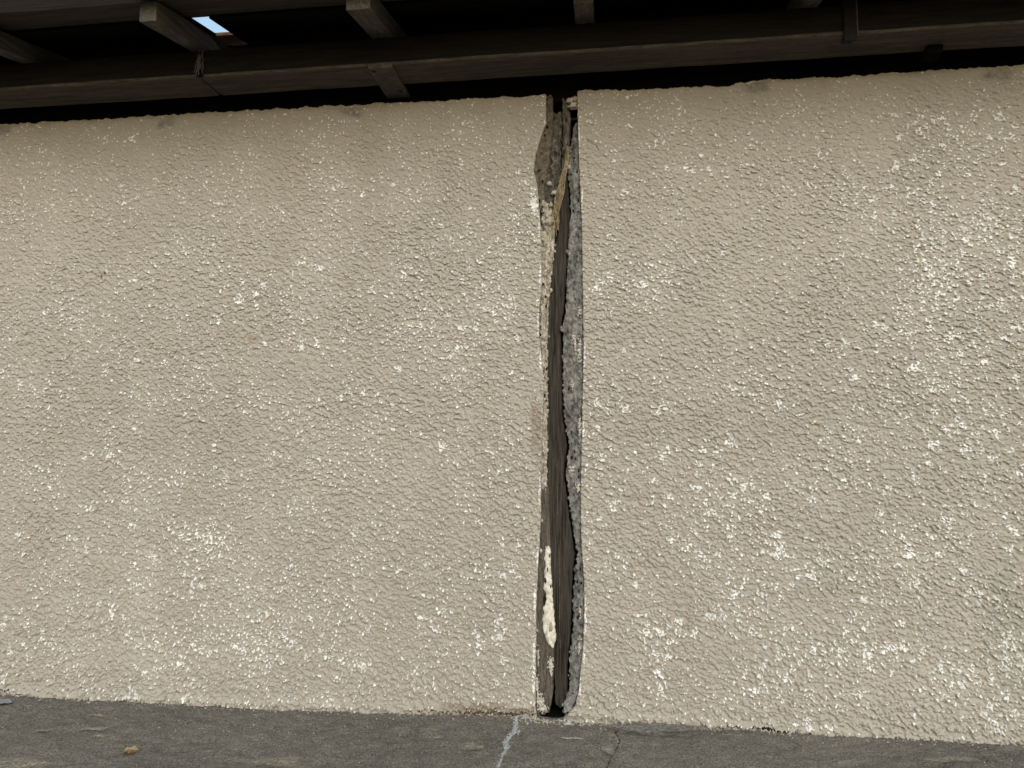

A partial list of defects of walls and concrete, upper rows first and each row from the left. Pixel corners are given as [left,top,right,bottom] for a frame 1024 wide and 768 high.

crack [551,276,559,349]
crack [556,582,564,676]